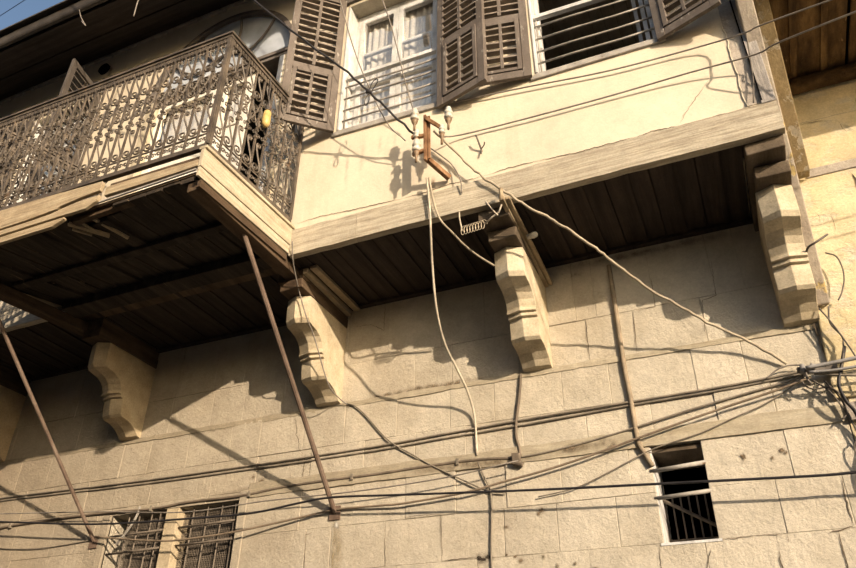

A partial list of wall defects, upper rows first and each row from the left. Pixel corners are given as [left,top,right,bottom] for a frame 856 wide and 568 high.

crack [306,81,725,221]